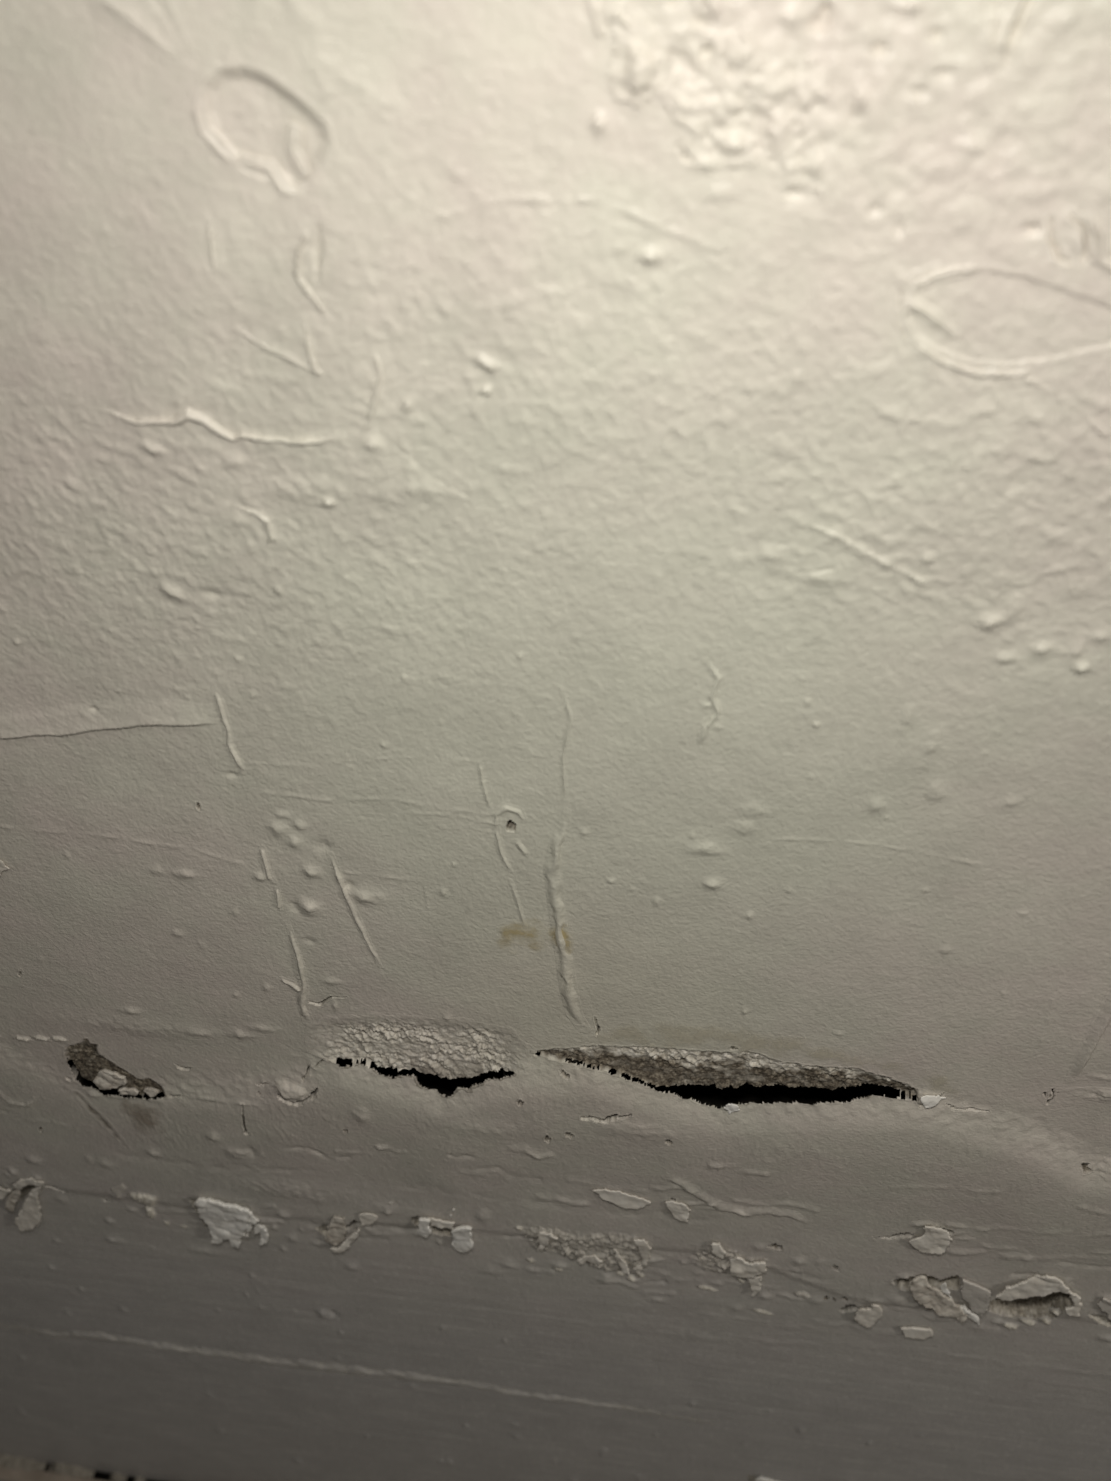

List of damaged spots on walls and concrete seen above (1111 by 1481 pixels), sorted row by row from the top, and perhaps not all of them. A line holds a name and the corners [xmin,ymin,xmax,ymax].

spalling [0,1034,189,1101]
spalling [301,1012,991,1114]
peeling [0,1178,71,1231]
peeling [100,1182,269,1248]
peeling [513,1224,654,1282]
peeling [794,1290,882,1328]
peeling [888,1274,1111,1340]